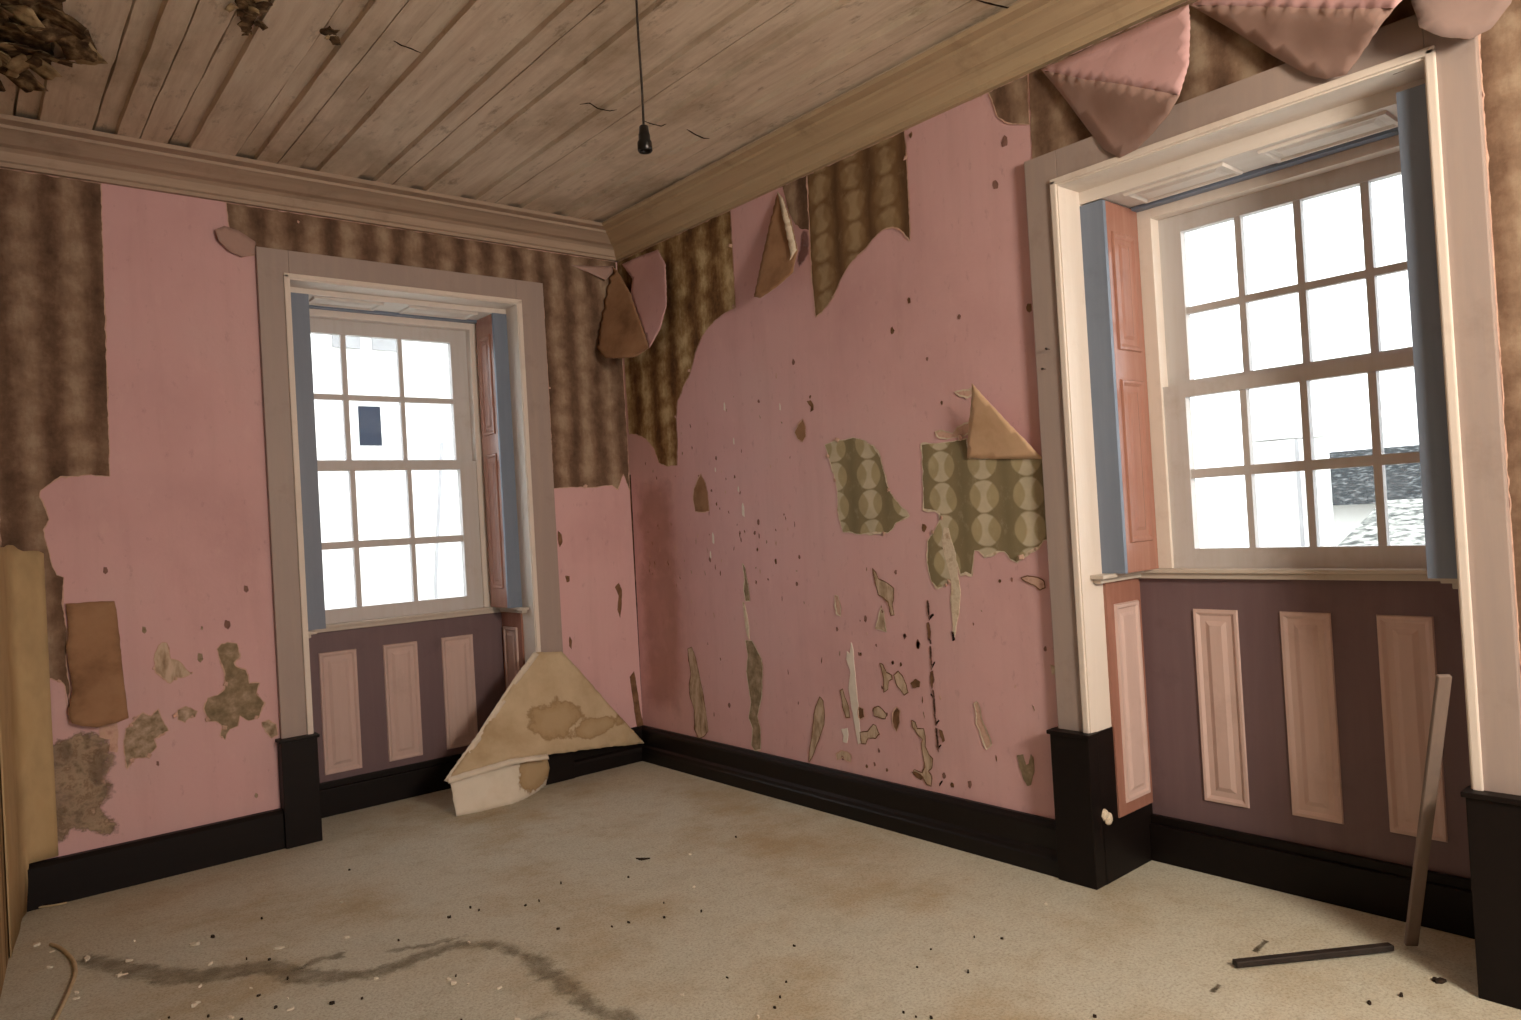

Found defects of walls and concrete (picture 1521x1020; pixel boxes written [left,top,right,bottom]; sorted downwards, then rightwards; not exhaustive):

peeling [0,0,108,93]
peeling [225,0,273,36]
peeling [319,26,341,45]
peeling [970,0,1285,159]
peeling [1379,0,1416,28]
peeling [780,129,912,318]
peeling [224,202,736,491]
peeling [1478,0,1521,677]
peeling [0,168,110,723]
peeling [825,434,1047,589]
damp [53,732,117,841]